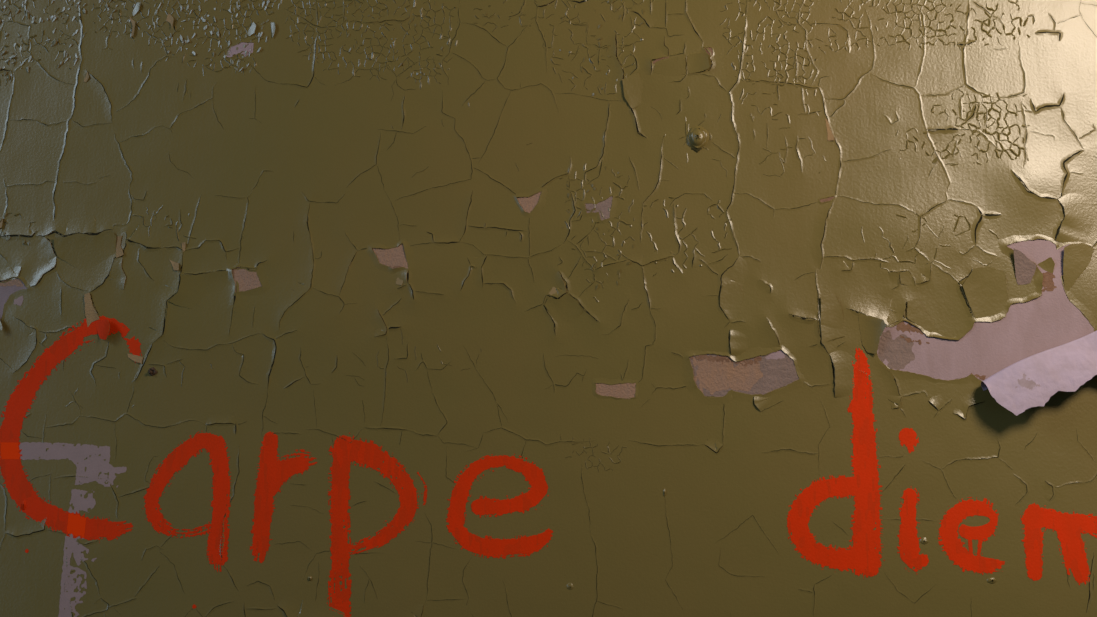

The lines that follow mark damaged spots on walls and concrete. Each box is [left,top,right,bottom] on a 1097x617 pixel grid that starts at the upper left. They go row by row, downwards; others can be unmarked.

peeling [129,2,140,37]
peeling [224,22,256,59]
peeling [512,187,547,218]
peeling [0,276,32,330]
peeling [226,260,270,296]
peeling [366,239,414,285]
peeling [858,234,1097,416]
peeling [682,345,806,405]
crack [879,429,1097,505]
crack [0,455,159,617]
crack [183,446,345,617]
crack [1064,552,1096,613]